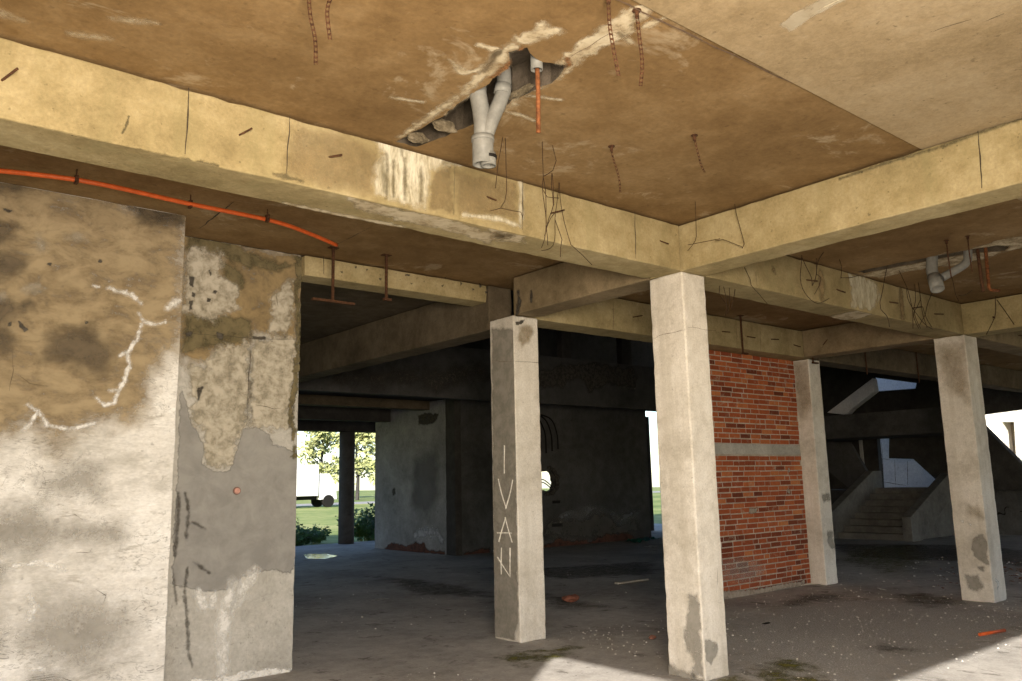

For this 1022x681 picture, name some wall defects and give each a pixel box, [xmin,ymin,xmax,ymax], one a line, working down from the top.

damp [560,5,663,77]
damp [292,22,561,205]
spalling [432,118,457,133]
damp [460,177,523,226]
damp [0,182,301,443]
flaking render [182,246,239,320]
flaking render [188,256,302,469]